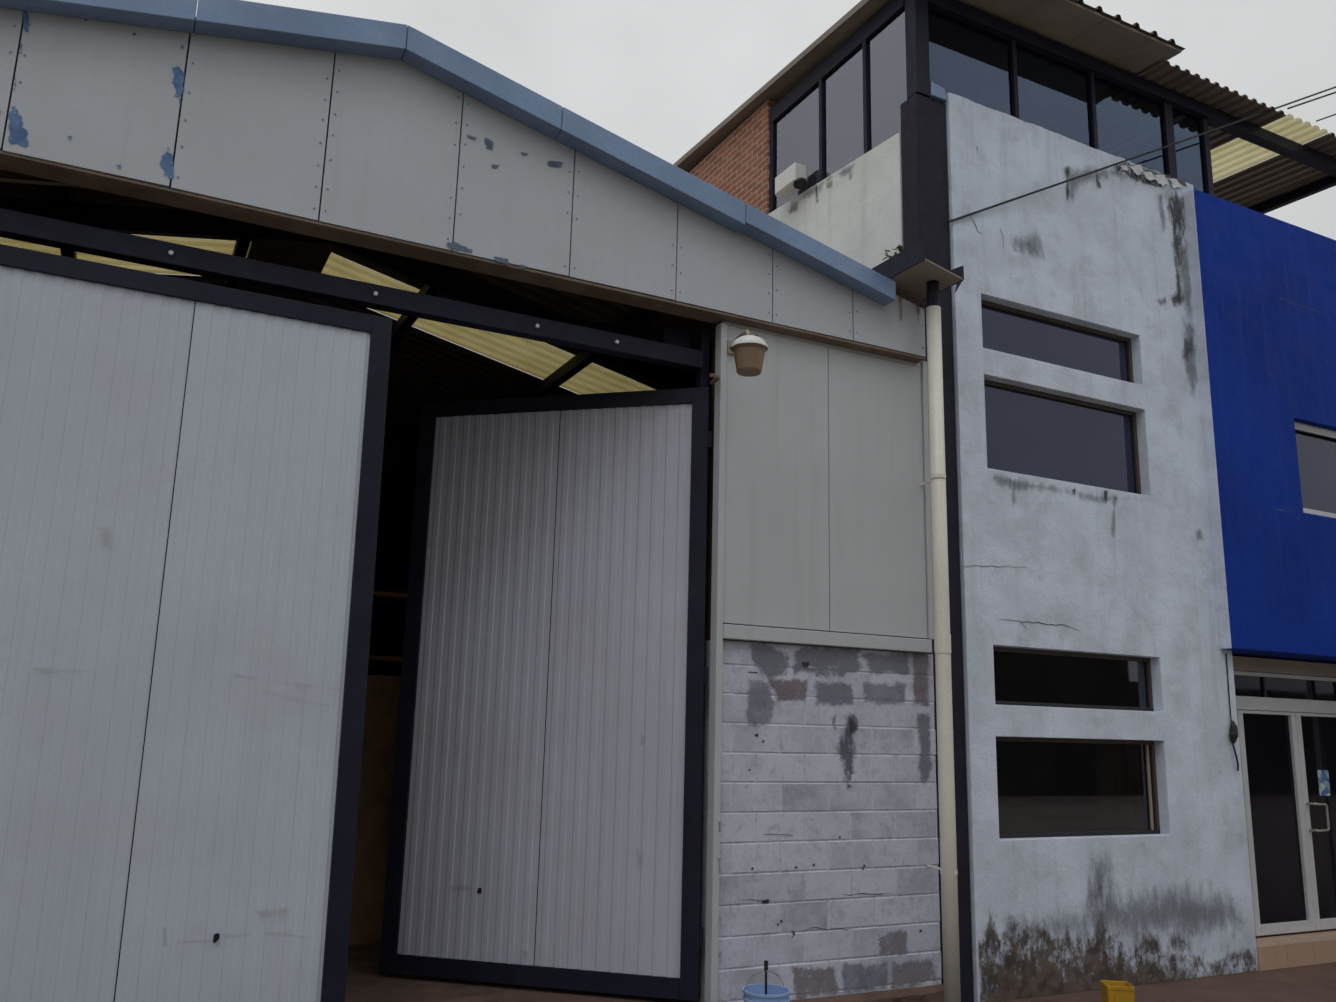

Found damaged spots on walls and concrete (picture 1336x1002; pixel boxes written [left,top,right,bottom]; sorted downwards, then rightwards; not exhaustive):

peeling [172,66,185,104]
peeling [8,106,29,147]
peeling [159,151,174,179]
peeling [467,134,499,168]
leakage [1160,193,1190,306]
leakage [1184,326,1196,381]
leakage [833,715,858,788]
leakage [978,870,1258,1002]